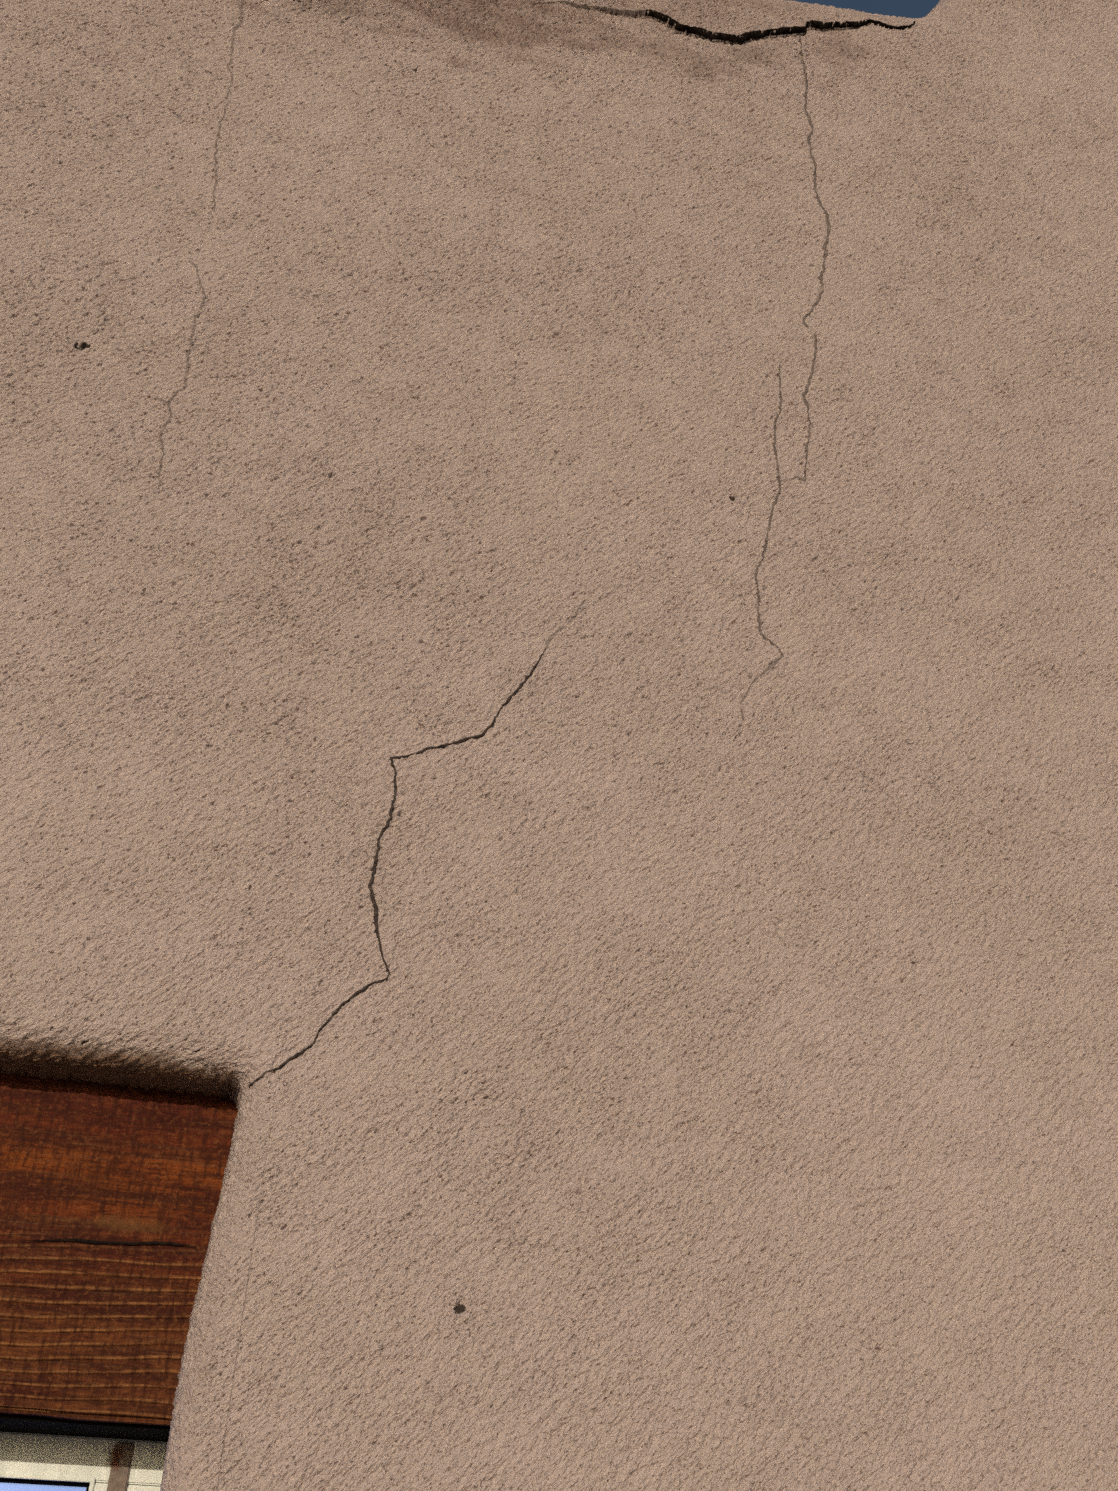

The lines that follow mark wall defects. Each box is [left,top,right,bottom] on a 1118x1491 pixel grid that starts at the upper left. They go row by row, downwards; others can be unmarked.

crack [645,9,916,43]
crack [249,648,546,1088]